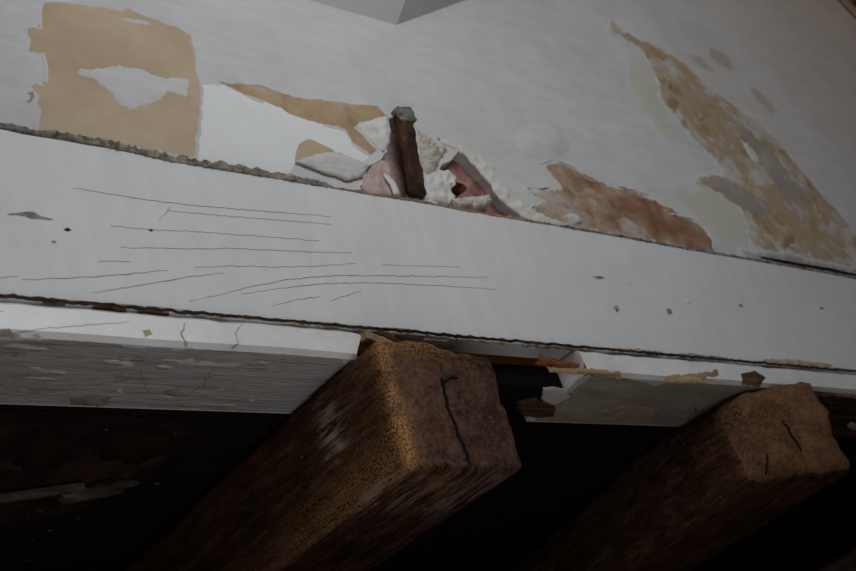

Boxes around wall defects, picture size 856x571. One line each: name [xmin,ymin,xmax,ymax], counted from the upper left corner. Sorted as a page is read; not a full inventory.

peeling [23,0,406,198]
peeling [595,16,856,267]
leakage [601,26,856,277]
peeling [418,131,716,251]
peeling [0,329,50,351]
peeling [281,322,364,333]
peeling [469,339,596,352]
peeling [665,369,724,385]
peeling [741,359,832,388]